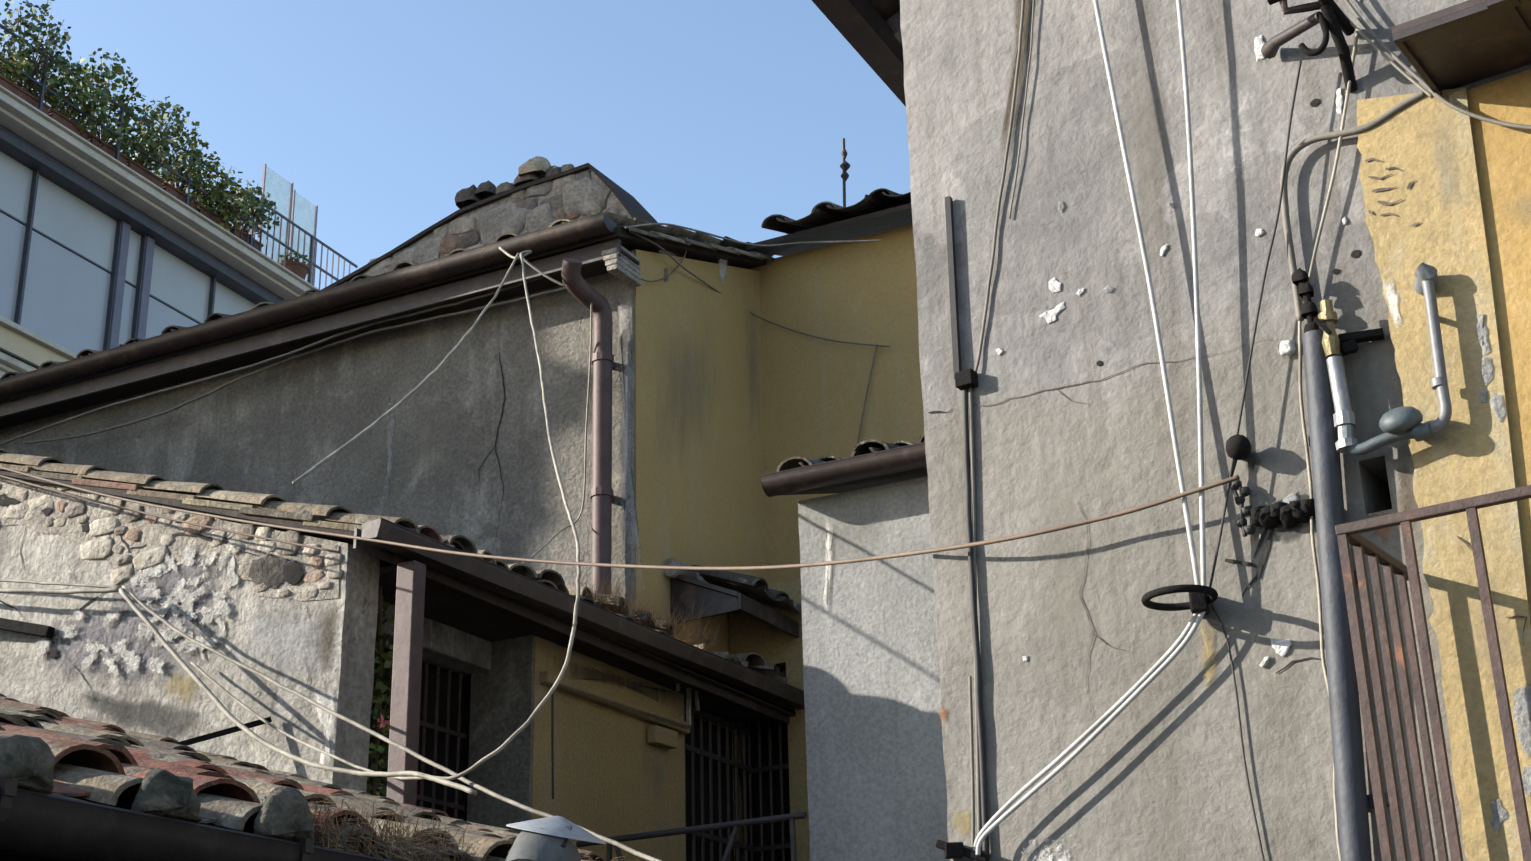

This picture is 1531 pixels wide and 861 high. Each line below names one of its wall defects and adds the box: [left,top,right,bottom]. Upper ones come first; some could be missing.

spalling [1039,277,1084,324]
crack [478,352,506,537]
flaking render [0,462,344,679]
peeling [1513,684,1531,796]
peeling [1490,799,1508,835]